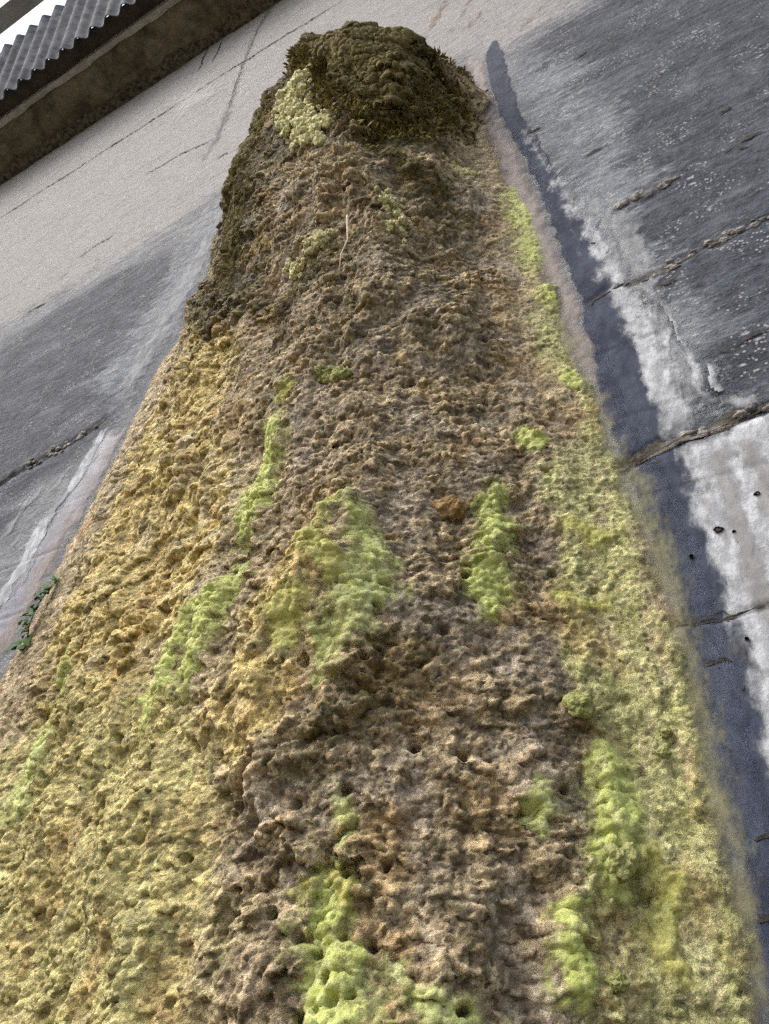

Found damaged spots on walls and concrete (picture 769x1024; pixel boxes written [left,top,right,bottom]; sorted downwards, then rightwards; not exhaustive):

crack [0,0,343,218]
crack [0,465,25,485]